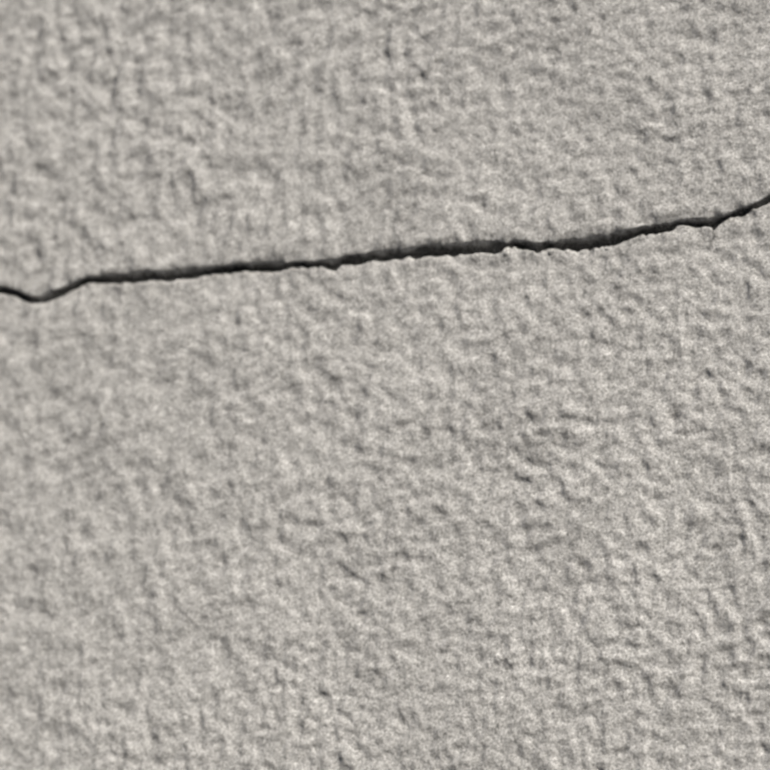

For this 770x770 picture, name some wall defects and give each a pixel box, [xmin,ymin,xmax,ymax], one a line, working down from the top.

crack [0,196,770,304]